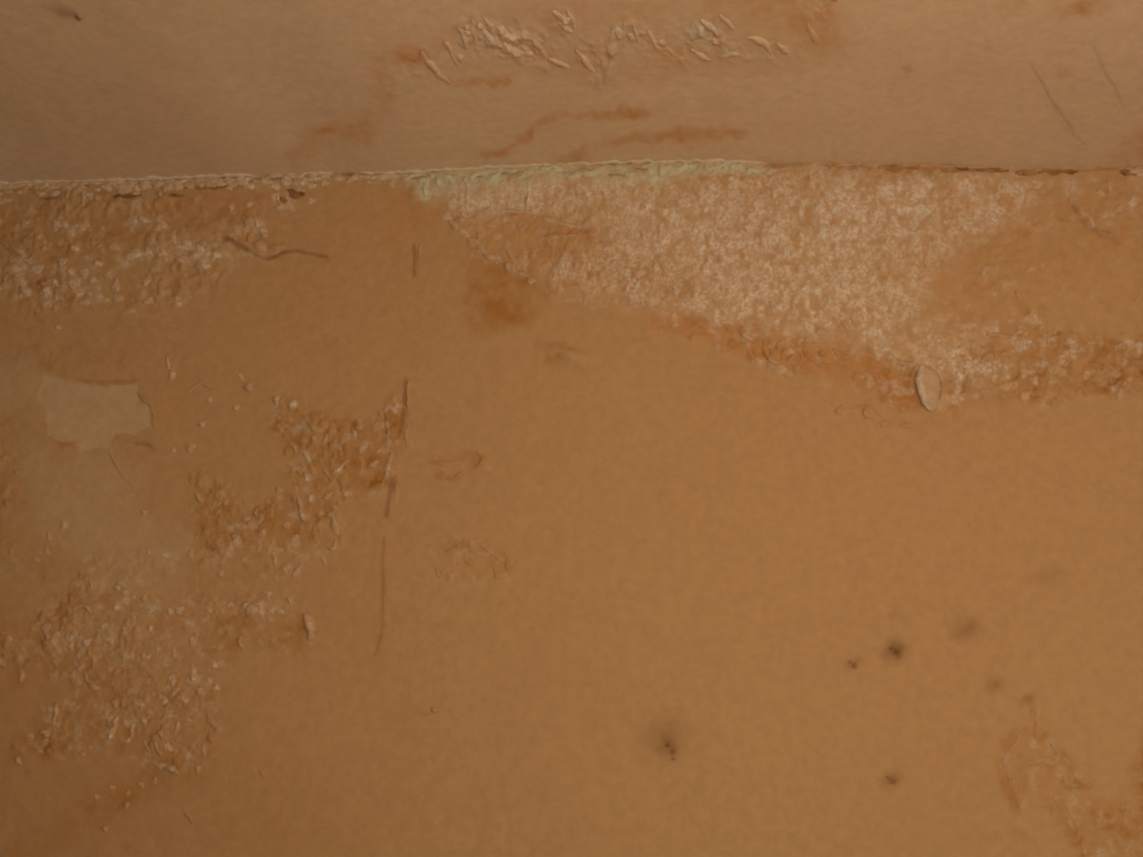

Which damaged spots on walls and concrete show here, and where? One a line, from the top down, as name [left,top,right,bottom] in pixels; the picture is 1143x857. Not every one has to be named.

spalling [246,176,332,223]
peeling [896,339,962,438]